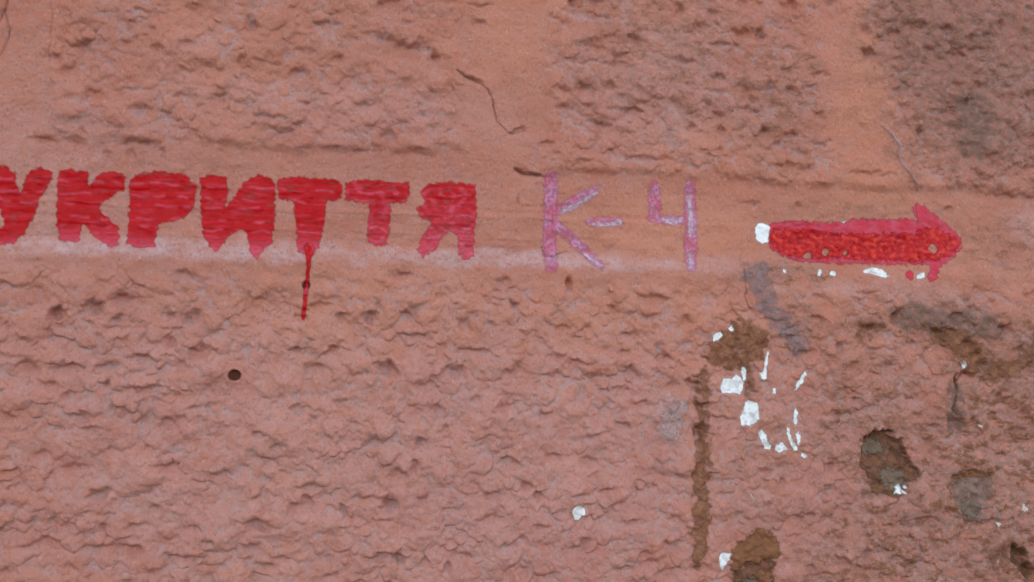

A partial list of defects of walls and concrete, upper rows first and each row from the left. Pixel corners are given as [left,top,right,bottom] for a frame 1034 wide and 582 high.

flaking render [859,429,919,498]
flaking render [951,469,1001,527]
flaking render [719,528,780,582]